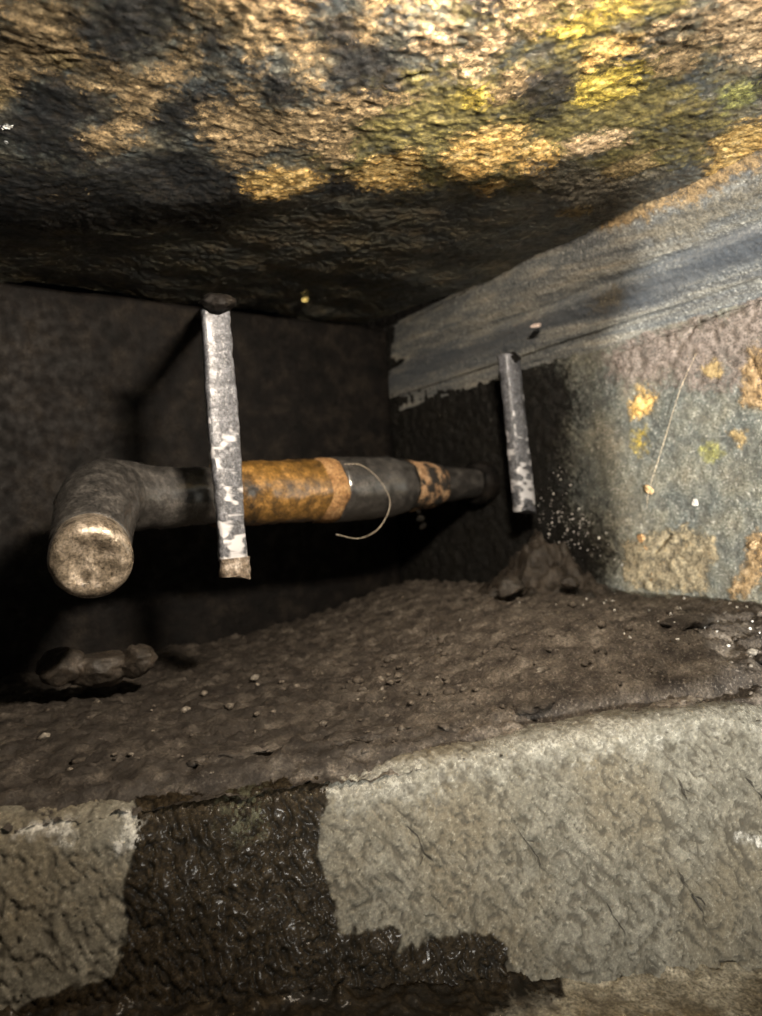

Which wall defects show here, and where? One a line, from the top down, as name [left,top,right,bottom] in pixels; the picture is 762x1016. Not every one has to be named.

damp [524,158,670,222]
damp [442,704,762,770]
damp [0,759,565,1016]